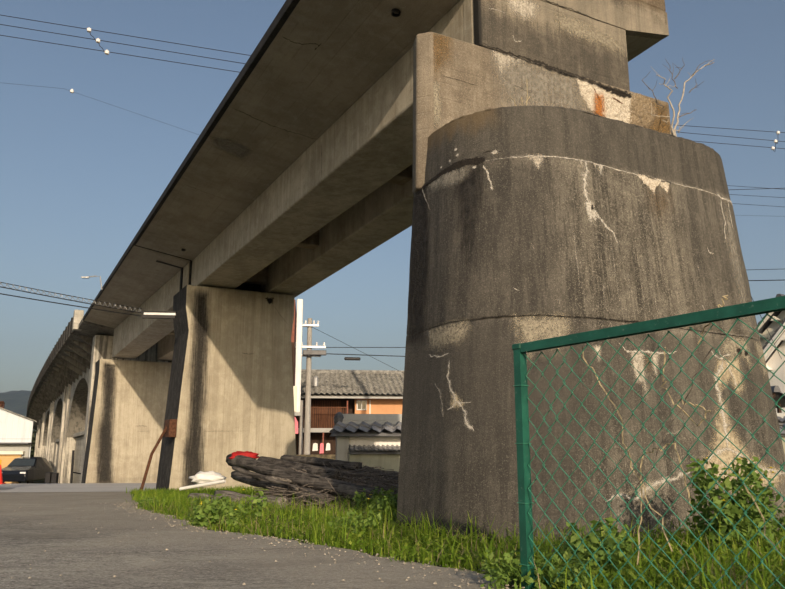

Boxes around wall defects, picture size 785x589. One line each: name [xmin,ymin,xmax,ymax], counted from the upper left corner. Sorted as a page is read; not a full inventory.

rust [595,95,604,116]
spalling [577,78,656,129]
crack [409,274,643,337]
leakage [97,363,116,483]
leakage [183,291,209,487]
crack [430,353,474,431]
crack [608,328,785,501]